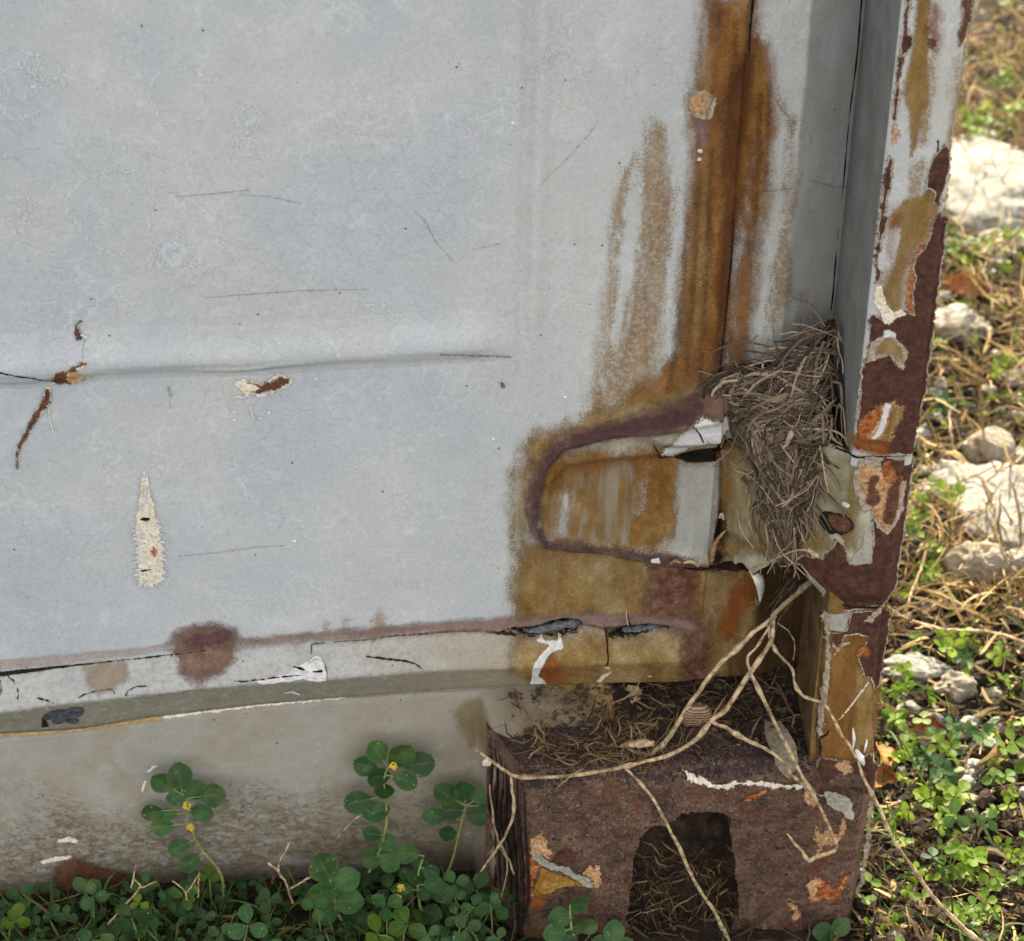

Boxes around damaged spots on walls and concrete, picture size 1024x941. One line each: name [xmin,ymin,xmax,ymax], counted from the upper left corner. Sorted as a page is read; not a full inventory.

peeling [864,285,909,370]
corrosion [15,387,54,469]
peeling [232,374,293,422]
corrosion [507,0,980,807]
peeling [857,400,905,443]
corrosion [0,611,627,685]
crack [311,611,688,669]
peeling [530,633,563,684]
peeling [816,610,852,736]
peeling [524,831,602,908]
corrosion [806,875,849,904]
corrosion [855,801,875,897]